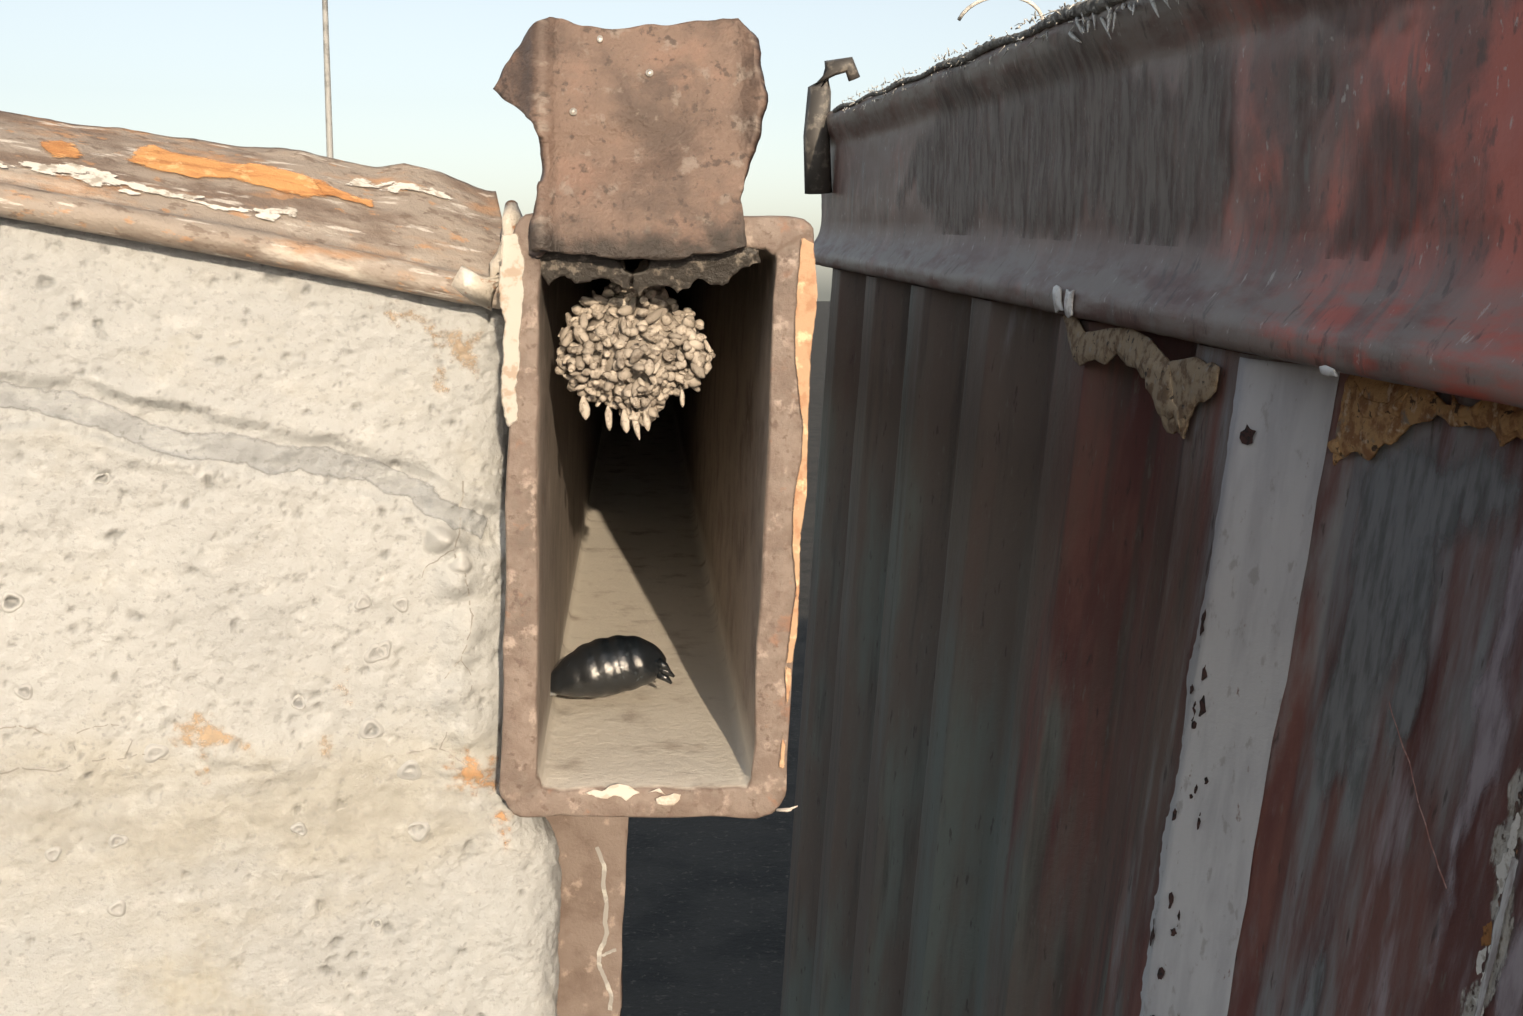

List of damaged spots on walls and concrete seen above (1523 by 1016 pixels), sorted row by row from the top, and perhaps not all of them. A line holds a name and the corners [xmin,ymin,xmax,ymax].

rust [128,145,373,207]
peeling [1137,356,1182,432]
crack [422,481,474,690]
crack [0,724,166,774]
crack [406,732,465,766]
peeling [1461,768,1523,1016]